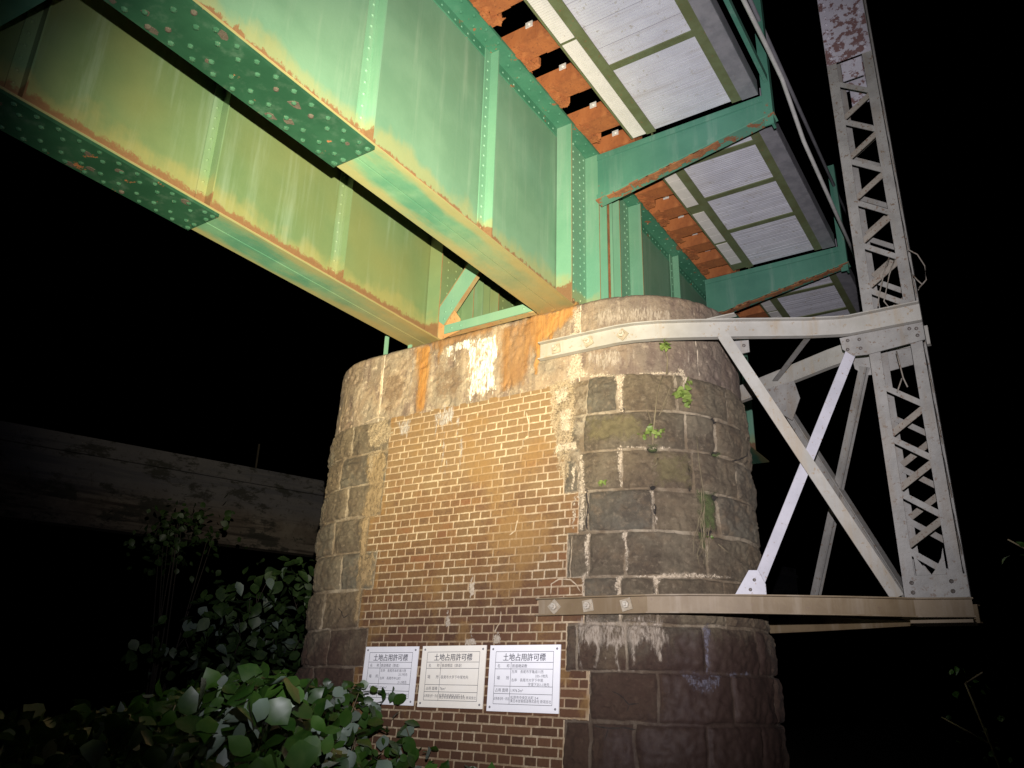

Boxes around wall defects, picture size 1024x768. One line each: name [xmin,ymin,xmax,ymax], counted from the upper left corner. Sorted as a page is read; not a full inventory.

corrosion [607,141,721,199]
corrosion [416,328,491,411]
efflorescence [446,336,497,401]
corrosion [502,305,575,390]
leakage [578,616,784,768]